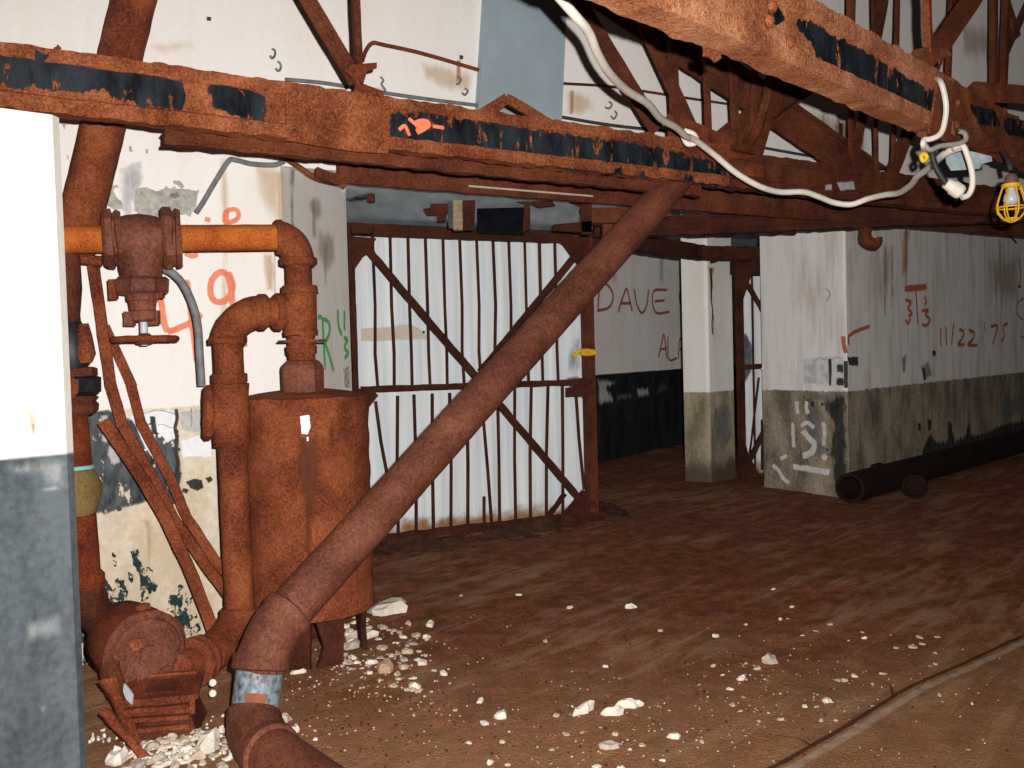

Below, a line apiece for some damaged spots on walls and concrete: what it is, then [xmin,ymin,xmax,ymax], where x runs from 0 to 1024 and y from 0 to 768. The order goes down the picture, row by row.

spalling [108,180,199,217]
corrosion [314,167,343,186]
peeling [88,408,212,513]
peeling [105,549,158,602]
peeling [166,584,201,636]